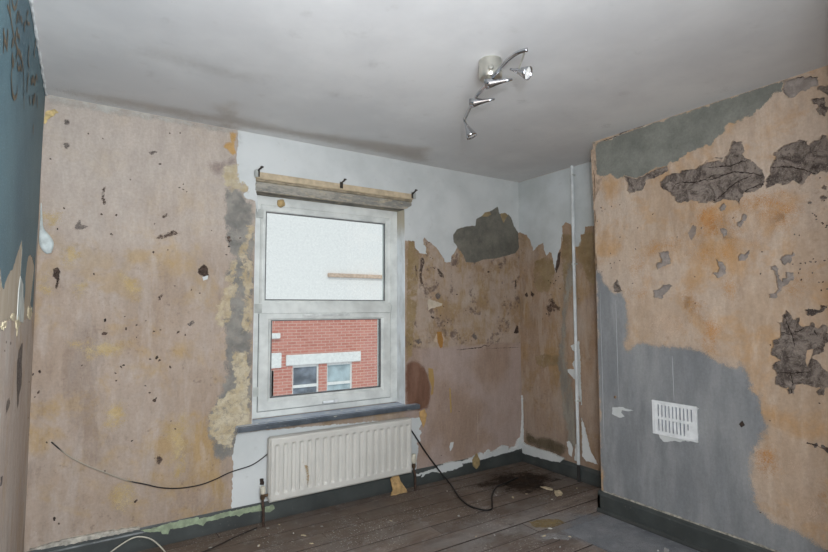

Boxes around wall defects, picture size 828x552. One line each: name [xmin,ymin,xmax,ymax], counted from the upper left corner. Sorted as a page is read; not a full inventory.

flaking render [783,76,828,116]
flaking render [625,135,828,211]
flaking render [654,284,672,299]
flaking render [769,253,826,298]
damp [405,241,434,412]
flaking render [770,305,828,404]
peeling [411,417,422,470]
peeling [567,418,597,464]
crack [806,442,828,453]
peeling [143,421,376,534]